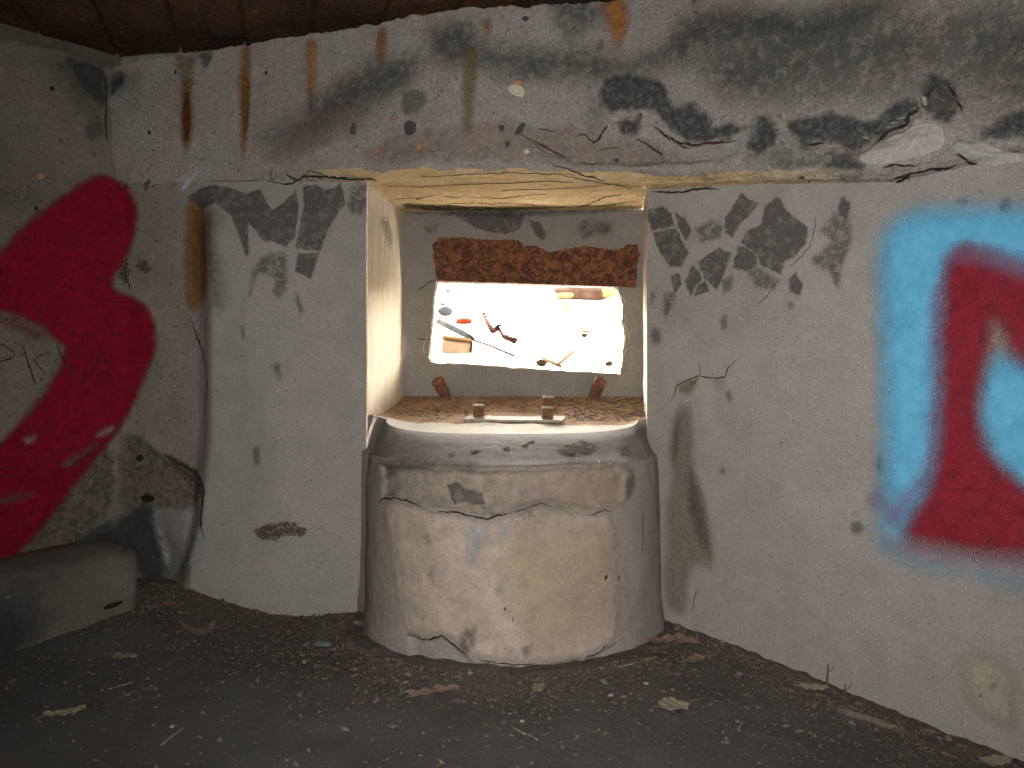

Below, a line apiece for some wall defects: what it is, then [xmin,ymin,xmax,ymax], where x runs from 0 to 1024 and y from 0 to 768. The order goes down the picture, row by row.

corrosion [179,57,193,147]
corrosion [241,47,249,143]
crack [948,84,963,111]
crack [270,125,737,208]
crack [873,107,977,183]
corrosion [186,203,206,308]
crack [189,315,208,413]
crack [670,360,736,401]
crack [378,497,557,520]
crack [409,635,536,666]